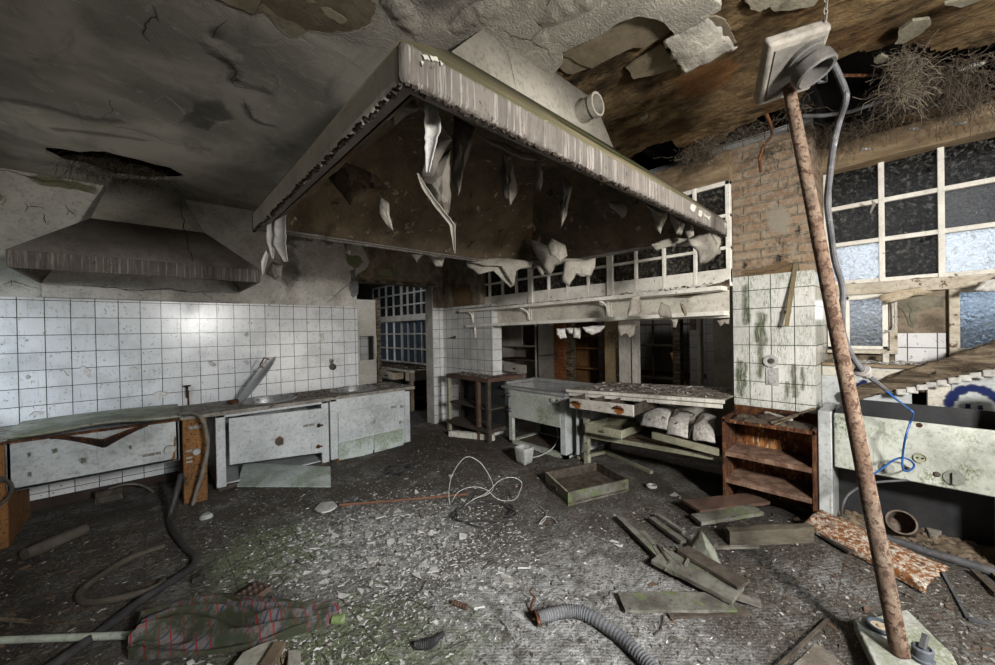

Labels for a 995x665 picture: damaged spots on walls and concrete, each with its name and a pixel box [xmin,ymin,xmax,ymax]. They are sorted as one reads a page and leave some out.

spalling [218,0,377,38]
crack [498,0,555,83]
spalling [559,15,738,79]
spalling [745,0,819,12]
crack [224,59,280,128]